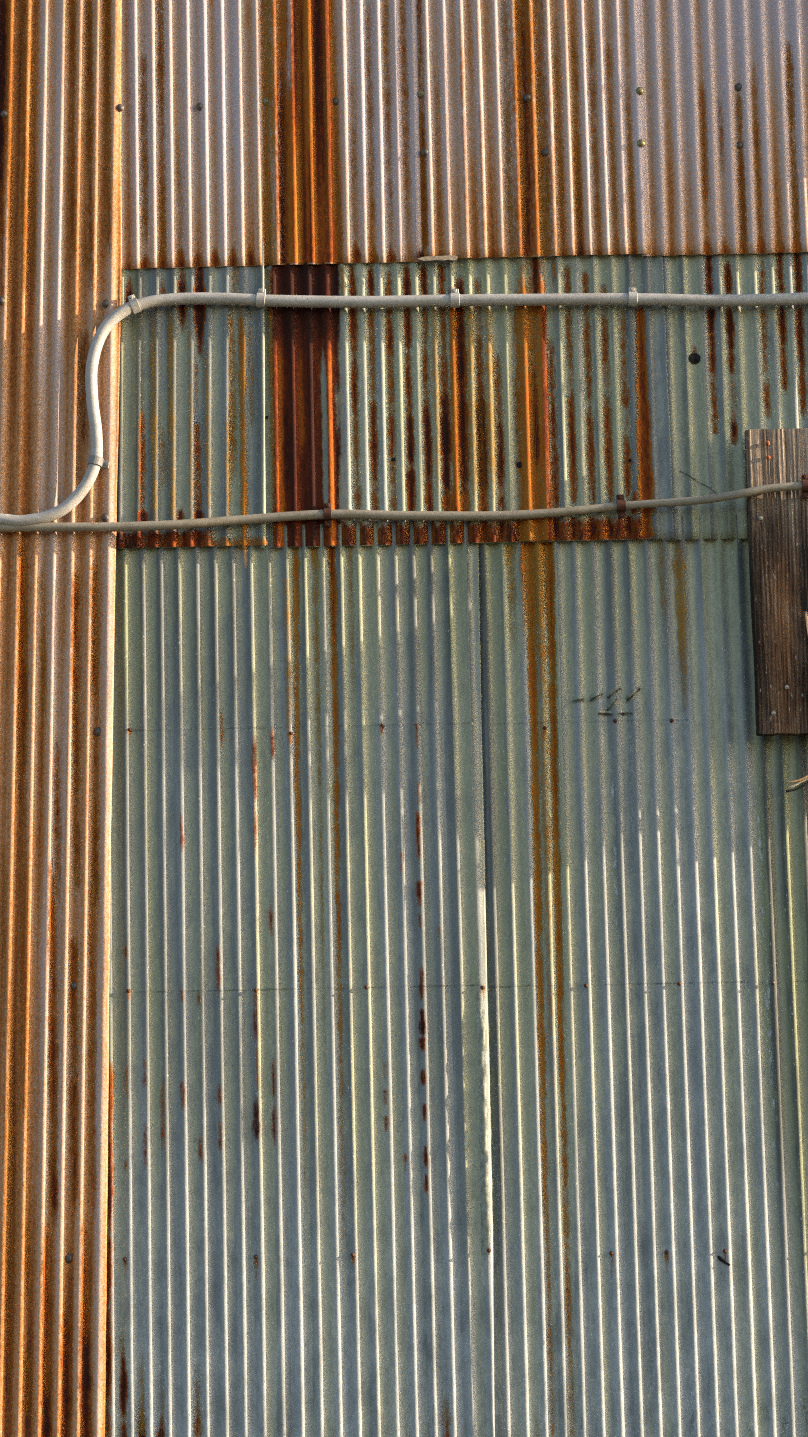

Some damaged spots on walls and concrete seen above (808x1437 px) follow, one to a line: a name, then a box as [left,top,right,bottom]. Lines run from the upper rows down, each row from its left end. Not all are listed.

rust [0,0,35,297]
rust [80,333,89,444]
rust [69,0,111,282]
rust [700,47,806,444]
rust [116,0,687,1435]
rust [3,547,165,1437]